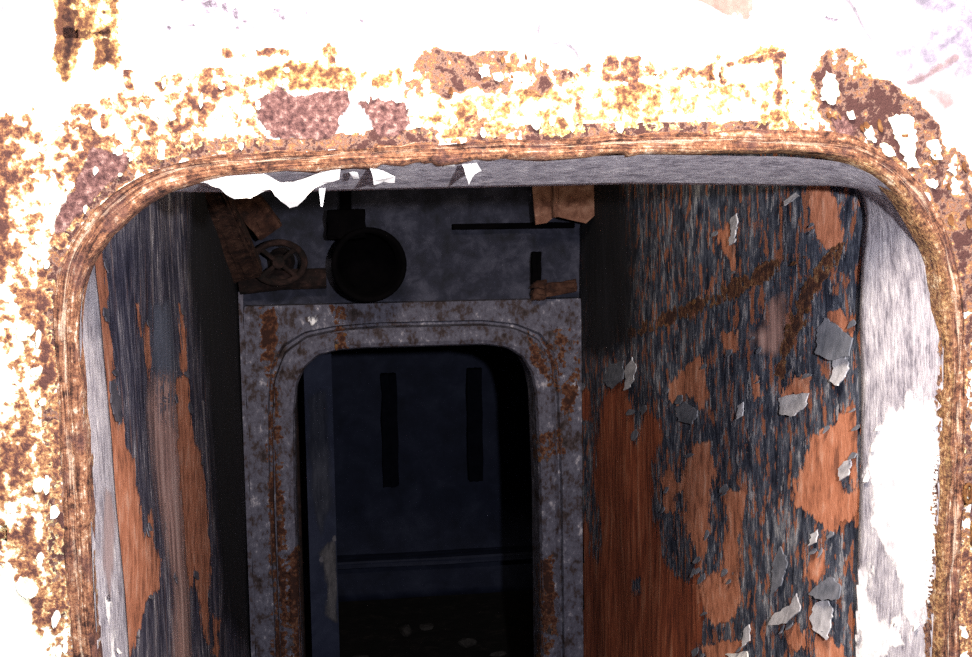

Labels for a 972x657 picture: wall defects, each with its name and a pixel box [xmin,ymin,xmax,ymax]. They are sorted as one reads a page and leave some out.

peeling [95,253,222,657]
peeling [200,169,359,208]
peeling [370,169,395,185]
rust [0,43,826,657]
peeling [444,163,481,184]
peeling [580,354,751,657]
peeling [784,186,844,250]
peeling [768,390,940,657]
rust [799,47,972,484]
damp [888,0,972,111]
rust [923,421,941,657]
rust [958,487,972,657]